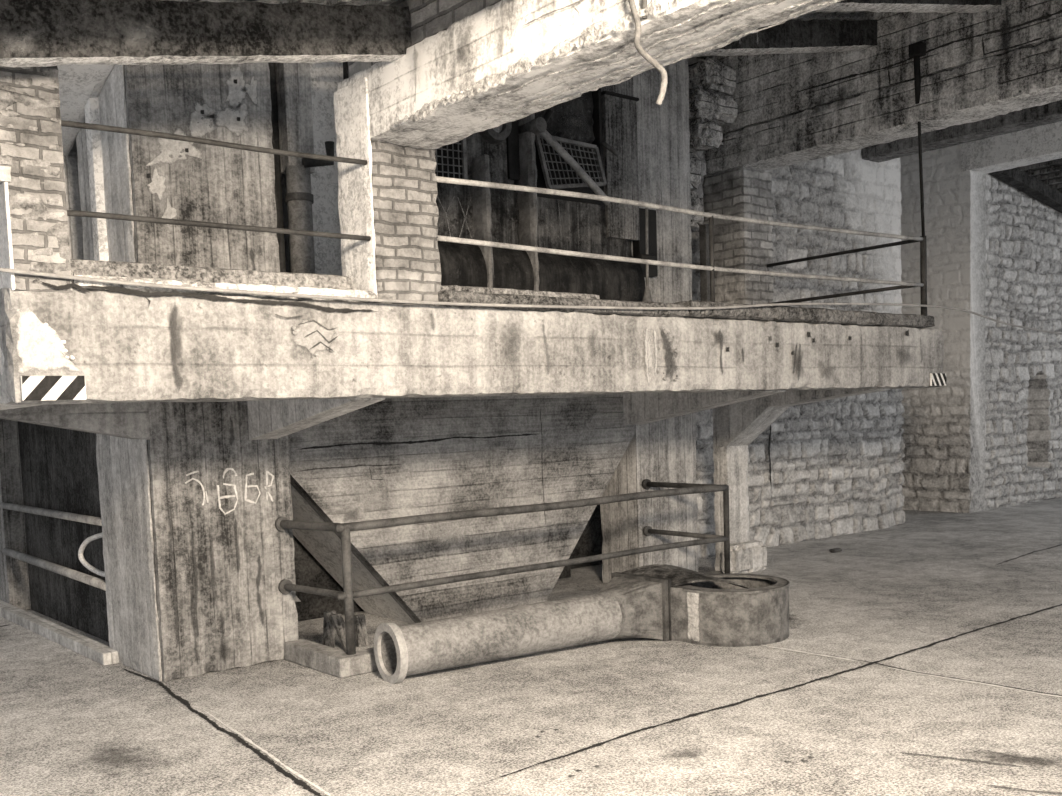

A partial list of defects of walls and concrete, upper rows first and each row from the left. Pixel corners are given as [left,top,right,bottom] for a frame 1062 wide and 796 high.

peeling [146,67,258,225]
peeling [16,309,81,373]
damp [166,464,178,647]
damp [256,556,264,624]
crack [123,668,332,796]
crack [455,604,1062,796]